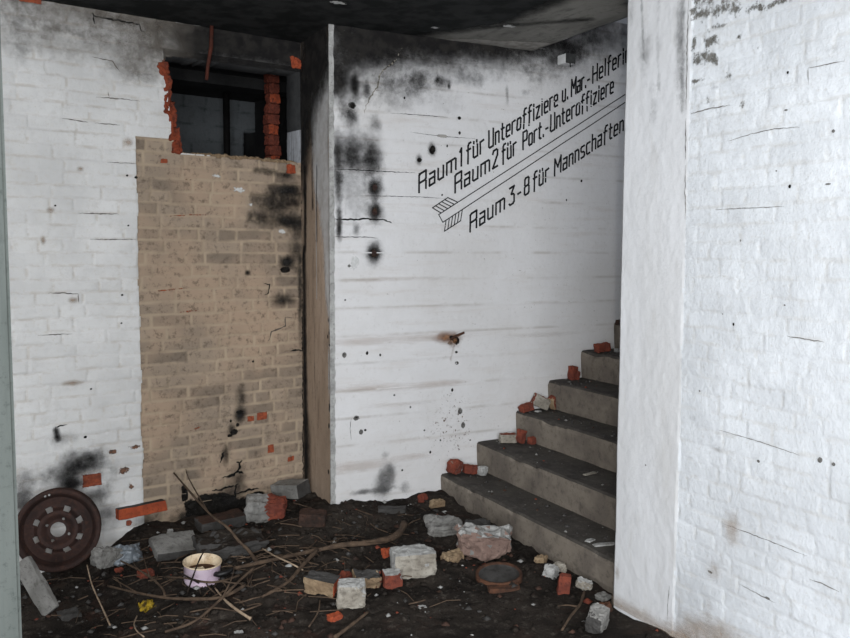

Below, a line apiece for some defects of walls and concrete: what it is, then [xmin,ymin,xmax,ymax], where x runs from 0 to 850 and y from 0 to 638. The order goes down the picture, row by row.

peeling [690,0,786,65]
water stain [352,75,369,95]
spalling [157,61,294,163]
spalling [228,410,267,437]
spalling [82,473,102,488]
crack [212,452,259,498]
water stain [359,466,394,494]